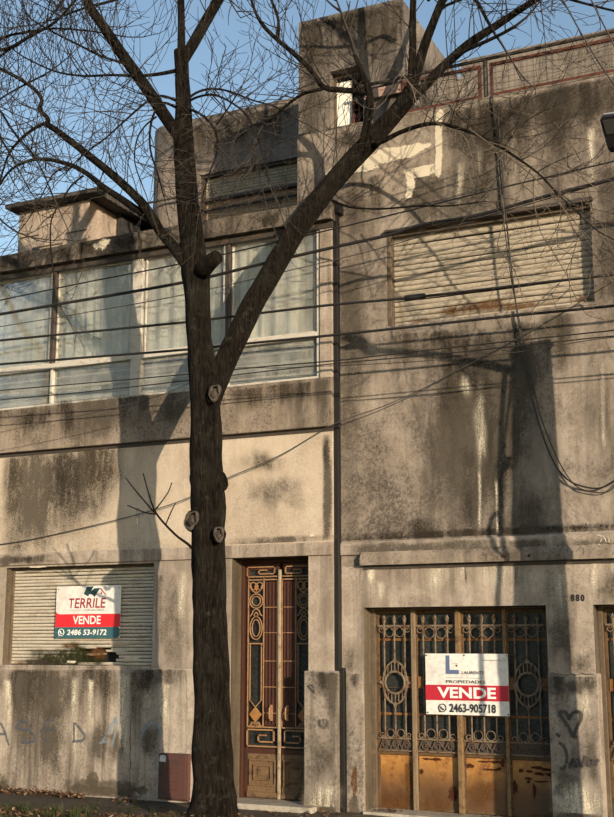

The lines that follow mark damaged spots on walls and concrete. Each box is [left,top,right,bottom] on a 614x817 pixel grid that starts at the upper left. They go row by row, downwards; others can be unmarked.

rust [446,300,538,315]
leakage [341,272,370,432]
leakage [344,314,614,553]
leakage [0,447,119,566]
leakage [5,670,179,764]
rust [384,758,442,809]
rust [426,787,458,812]
rust [466,759,505,771]
rust [513,766,551,800]